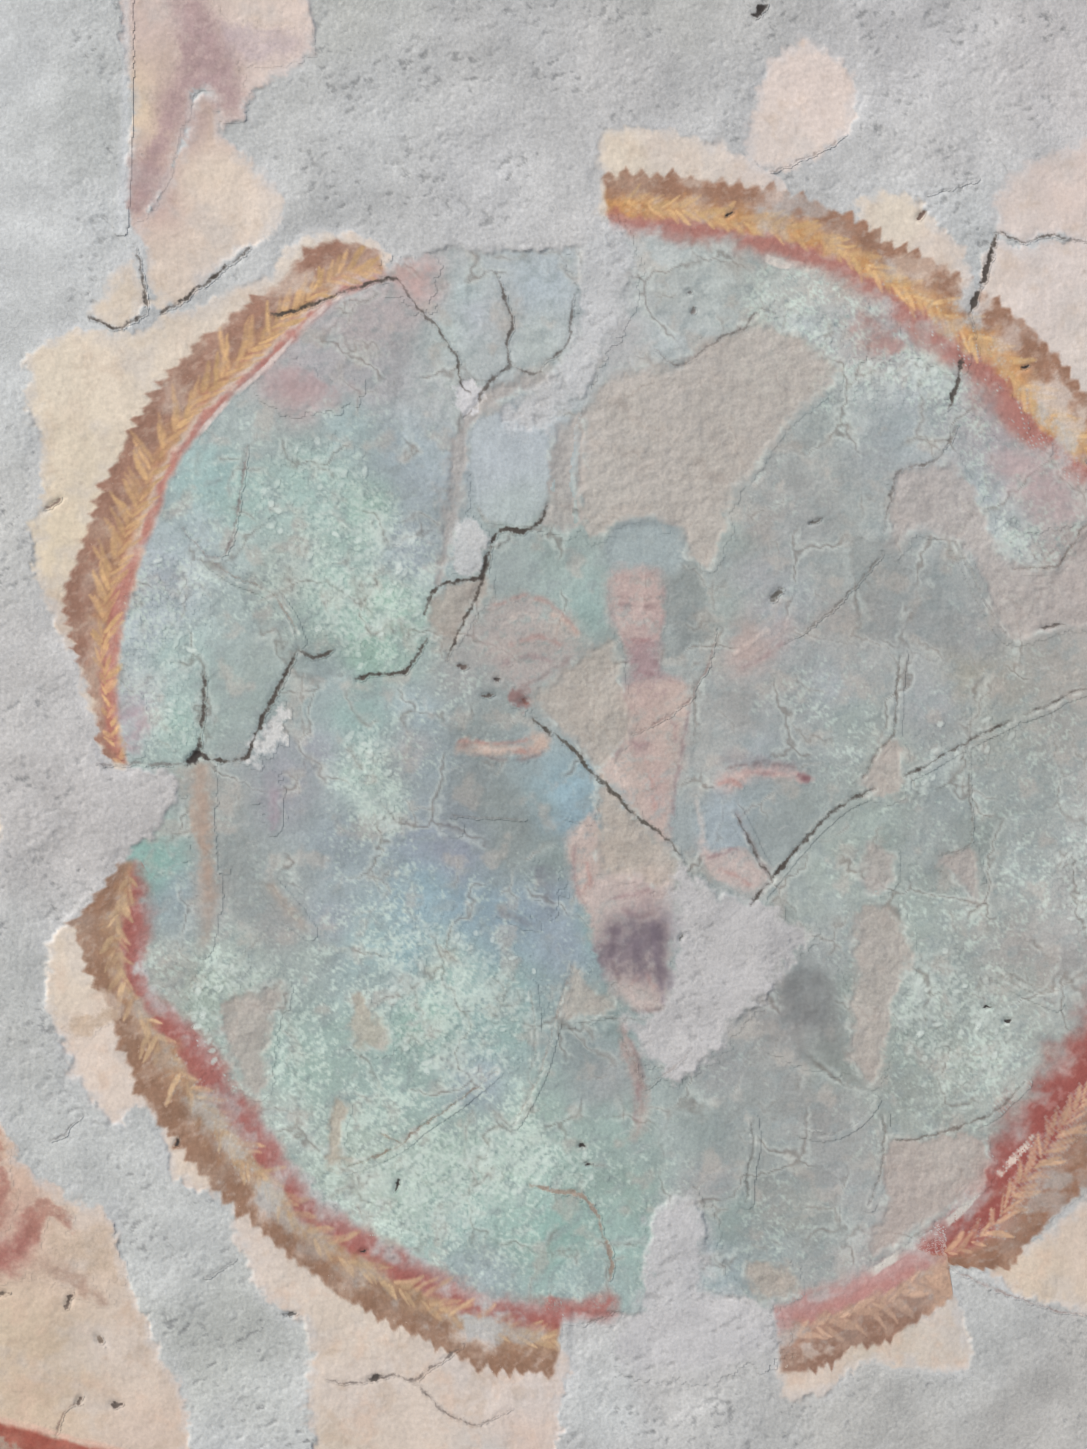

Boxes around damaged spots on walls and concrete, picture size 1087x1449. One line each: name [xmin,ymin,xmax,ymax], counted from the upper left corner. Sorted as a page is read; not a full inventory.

spalling [749,3,769,20]
crack [87,246,252,332]
crack [268,270,576,419]
crack [653,306,775,368]
spalling [42,496,62,511]
crack [783,230,1087,644]
peeling [112,534,215,768]
crack [95,444,550,768]
crack [531,717,682,857]
crack [727,648,1087,912]
spalling [62,1292,75,1311]
crack [324,1343,514,1427]